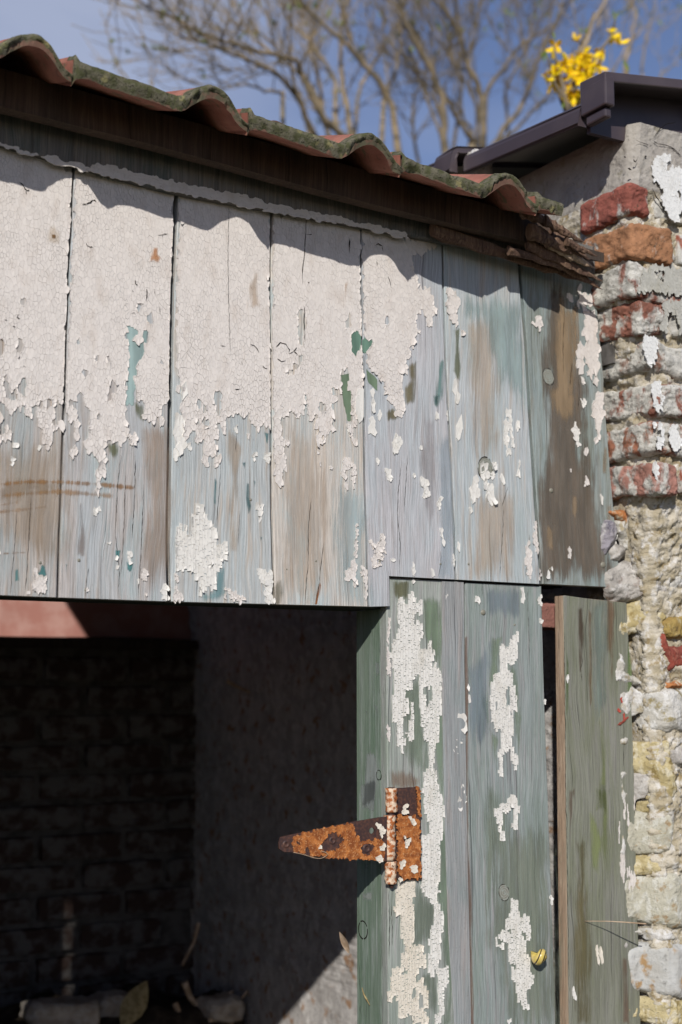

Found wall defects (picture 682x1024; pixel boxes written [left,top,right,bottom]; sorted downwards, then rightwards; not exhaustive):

peeling [651,153,682,223]
peeling [0,142,466,516]
crack [236,308,305,390]
peeling [637,262,682,368]
peeling [469,408,521,514]
water stain [539,289,611,581]
peeling [160,503,246,605]
peeling [490,631,519,777]
rust [291,786,422,881]
peeling [386,562,449,1024]
peeling [493,794,520,841]
peeling [495,898,534,1010]